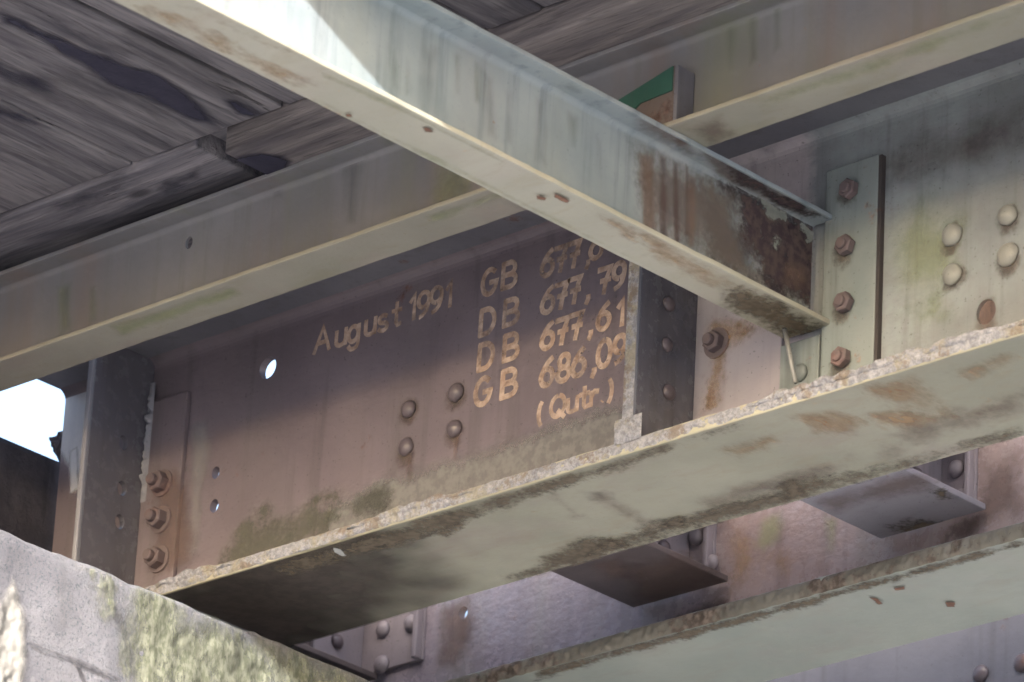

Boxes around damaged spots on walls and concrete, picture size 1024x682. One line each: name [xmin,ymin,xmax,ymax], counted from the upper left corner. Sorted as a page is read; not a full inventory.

rust [718,167,819,308]
peeling [748,322,1024,407]
damp [326,410,622,531]
peeling [614,413,642,445]
damp [891,520,937,532]
damp [164,532,434,647]